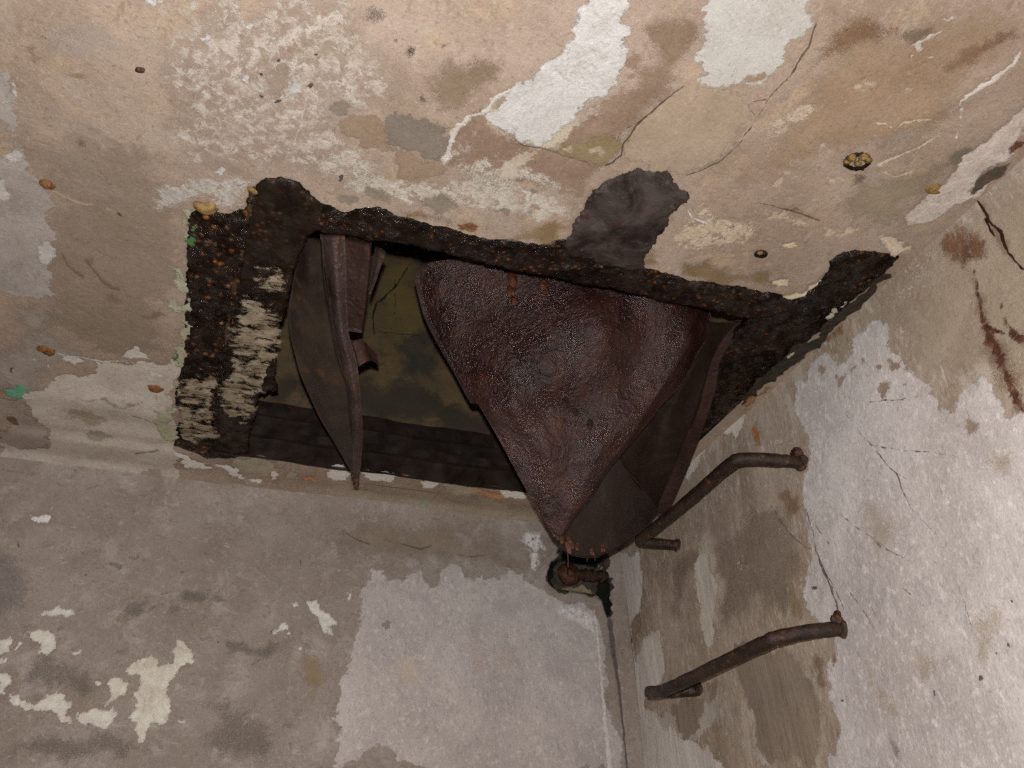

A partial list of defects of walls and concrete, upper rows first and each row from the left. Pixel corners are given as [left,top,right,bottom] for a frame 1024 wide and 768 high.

rust [457,222,480,234]
peeling [145,0,828,225]
leakage [466,219,568,245]
leakage [681,257,775,288]
crack [687,23,817,175]
peeling [905,109,1024,231]
rust [940,202,1024,421]
peeling [522,247,1024,768]
crack [848,417,956,535]
crack [771,502,925,645]
peeling [0,629,195,743]
rust [811,654,837,689]